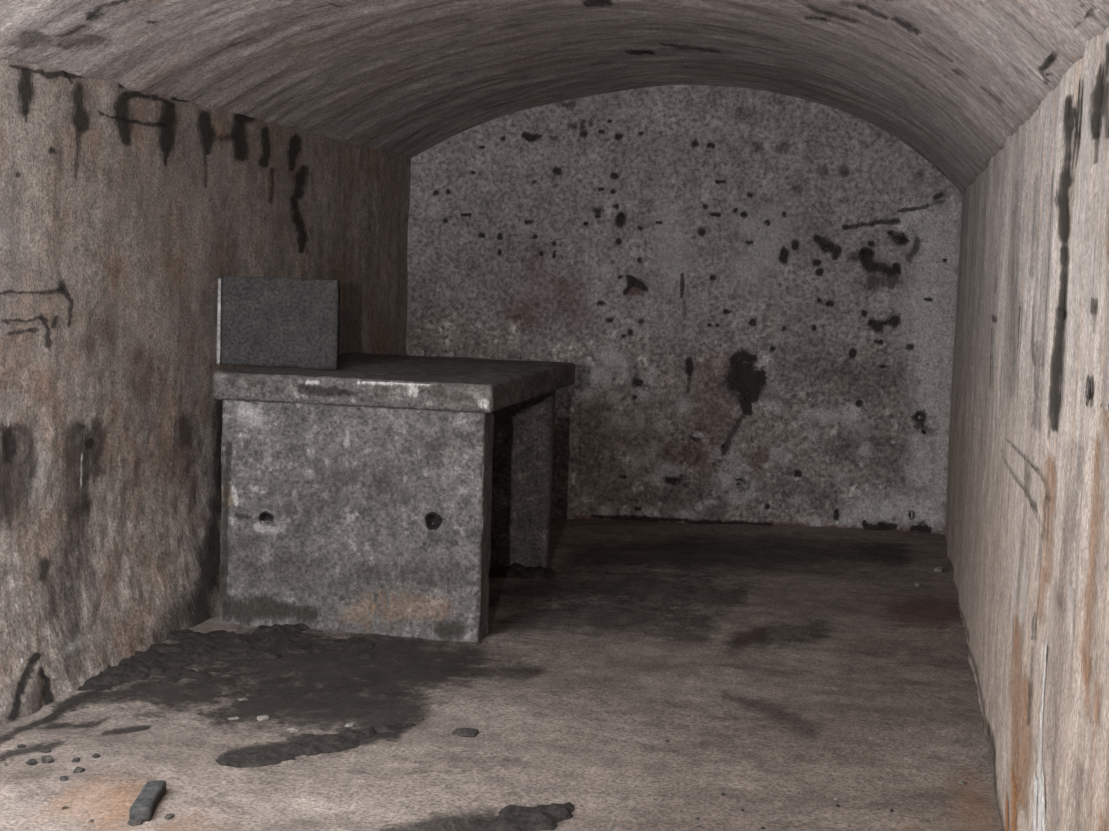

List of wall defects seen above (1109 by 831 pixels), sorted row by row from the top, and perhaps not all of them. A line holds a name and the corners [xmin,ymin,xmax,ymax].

water stain [17,67,35,122]
water stain [71,82,89,178]
water stain [114,91,140,146]
water stain [158,100,177,167]
water stain [197,110,274,202]
water stain [288,134,308,253]
water stain [1047,42,1109,435]
crack [0,281,73,347]
water stain [0,400,488,761]
water stain [384,811,496,831]